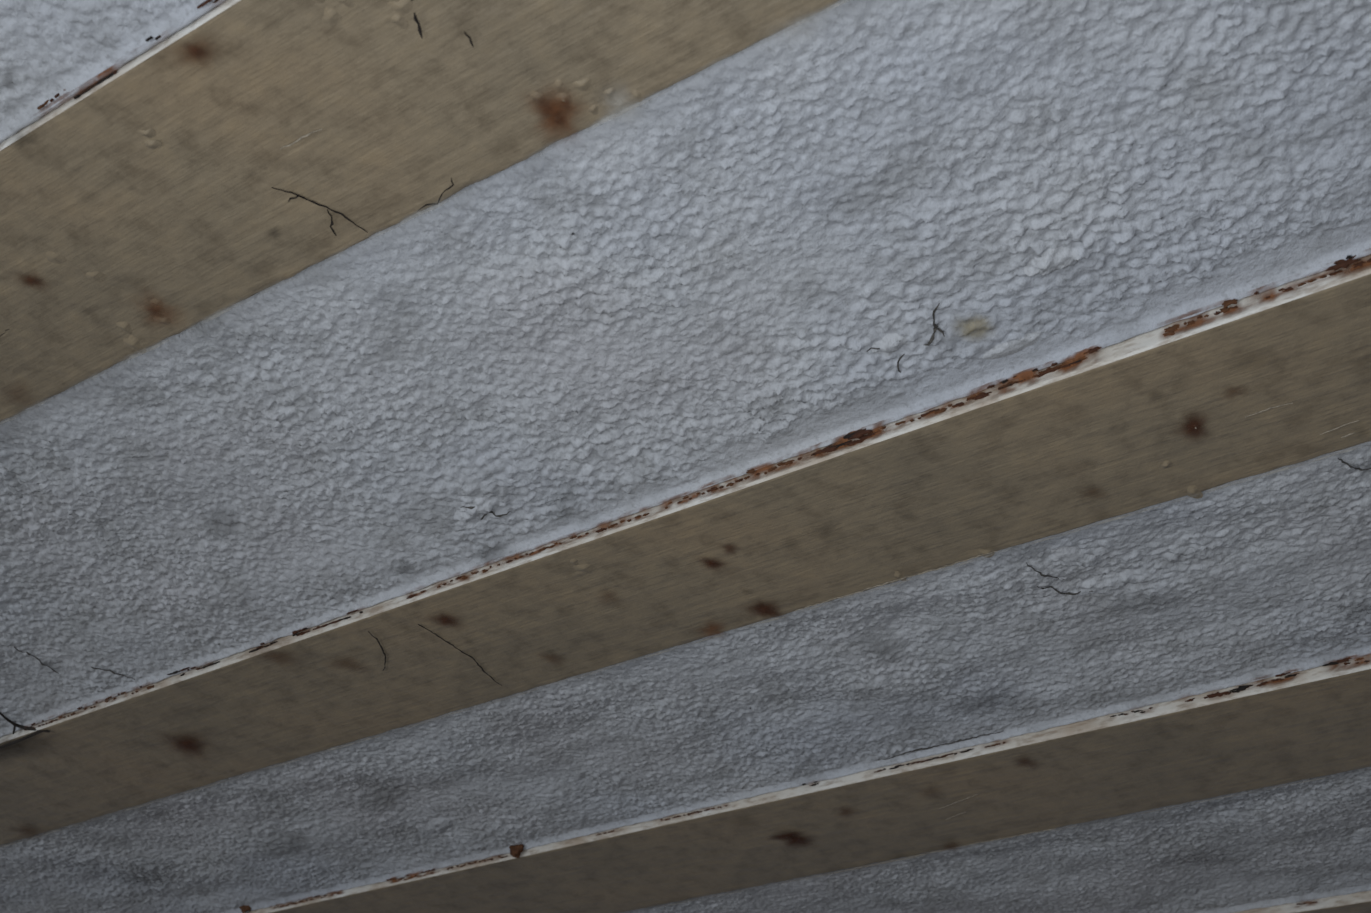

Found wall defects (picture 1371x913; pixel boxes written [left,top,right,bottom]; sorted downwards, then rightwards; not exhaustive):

rust [37,66,118,110]
rust [542,101,569,127]
rust [1254,255,1371,302]
rust [1163,299,1242,337]
rust [1322,654,1371,669]
rust [1185,670,1299,702]
rust [875,742,1006,772]